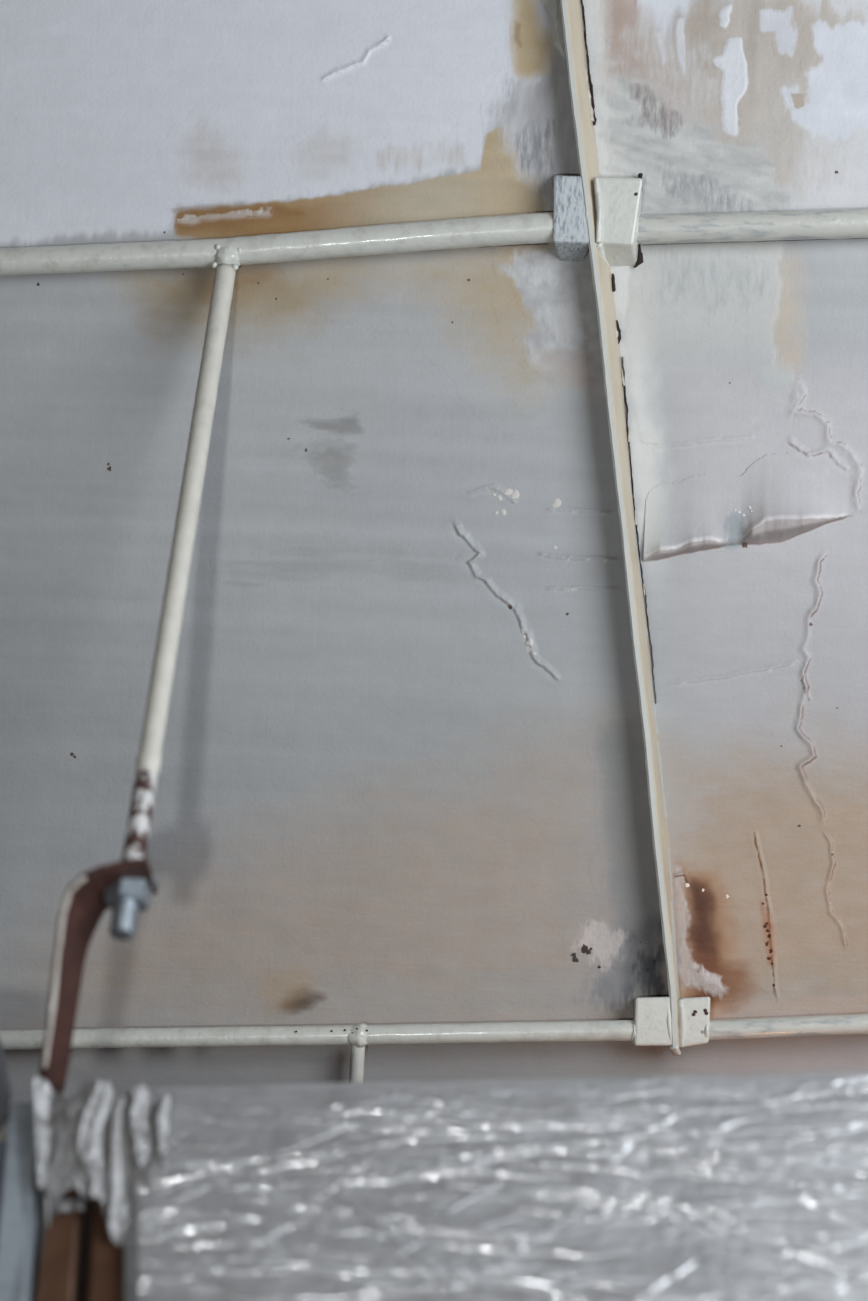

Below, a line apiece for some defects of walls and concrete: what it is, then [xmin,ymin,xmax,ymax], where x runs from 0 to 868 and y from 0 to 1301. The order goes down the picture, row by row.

flaking render [536,0,567,62]
peeling [594,0,868,210]
damp [304,194,536,231]
damp [284,245,580,435]
crack [792,548,853,951]
damp [0,813,129,1030]
damp [74,671,692,1029]
damp [4,1049,43,1105]
damp [64,1041,709,1099]